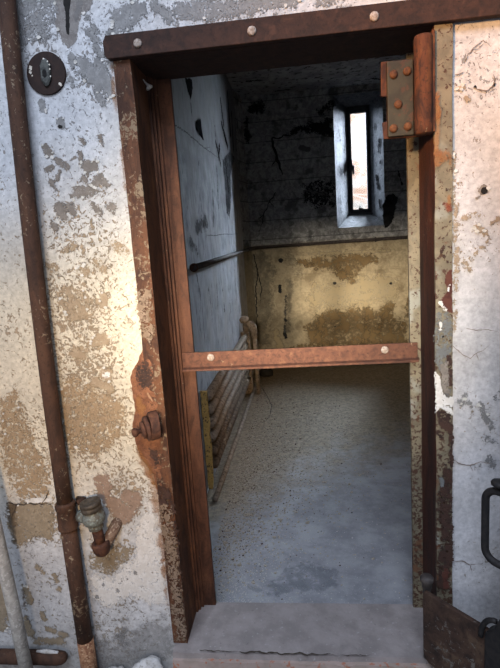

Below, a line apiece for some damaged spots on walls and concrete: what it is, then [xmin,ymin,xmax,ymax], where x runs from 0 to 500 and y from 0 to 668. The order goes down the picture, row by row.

peeling [41,143,70,192]
peeling [49,136,118,234]
crack [271,134,291,175]
peeling [75,258,109,277]
peeling [110,240,129,257]
crack [253,254,262,328]
peeling [433,149,500,592]
peeling [0,388,55,547]
crack [200,649,368,657]